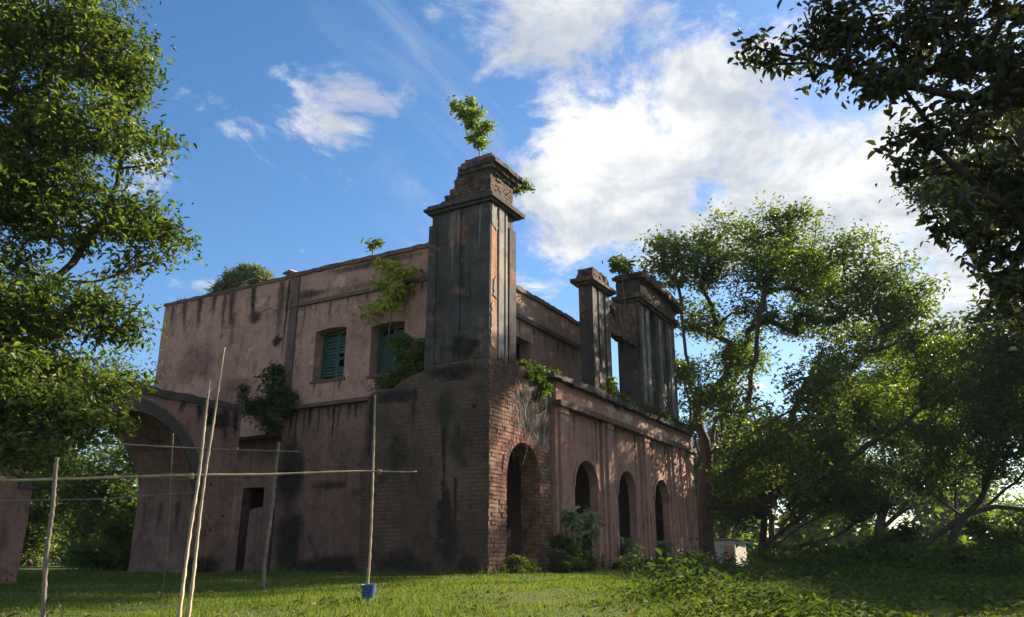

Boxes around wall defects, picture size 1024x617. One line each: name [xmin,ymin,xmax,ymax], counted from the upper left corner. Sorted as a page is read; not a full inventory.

damp [171,292,235,324]
damp [249,287,260,323]
damp [276,397,373,573]
damp [437,428,478,575]
peeling [504,384,569,552]